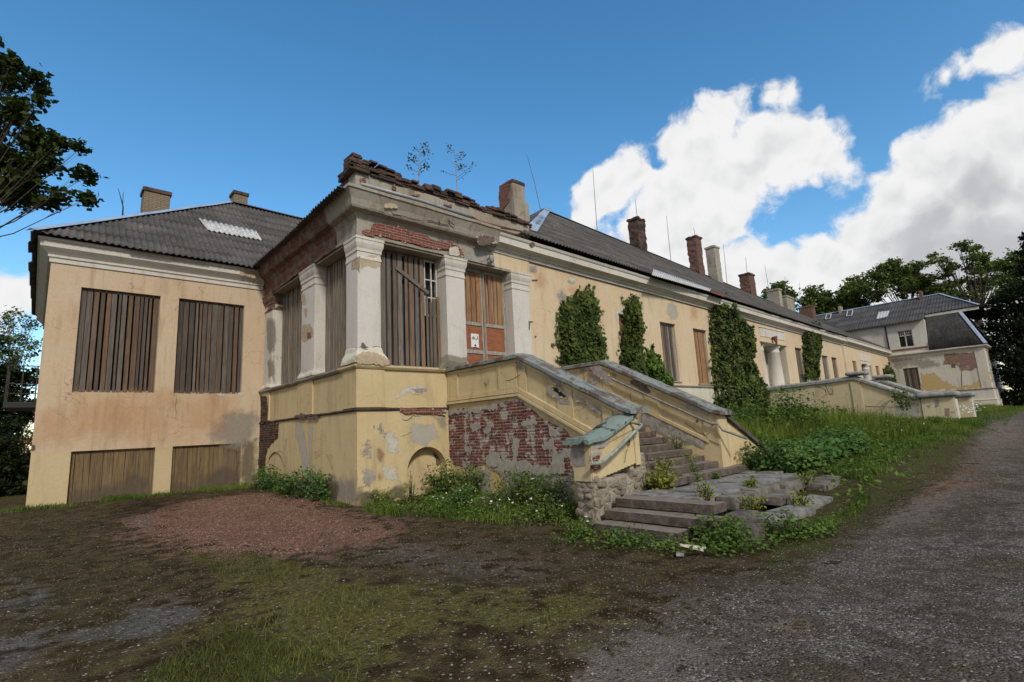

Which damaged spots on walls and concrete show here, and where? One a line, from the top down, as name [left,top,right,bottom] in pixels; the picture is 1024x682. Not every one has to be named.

spalling [362,223,497,261]
peeling [547,365,602,415]
peeling [896,351,993,417]
spalling [395,385,630,502]
spalling [0,395,479,638]